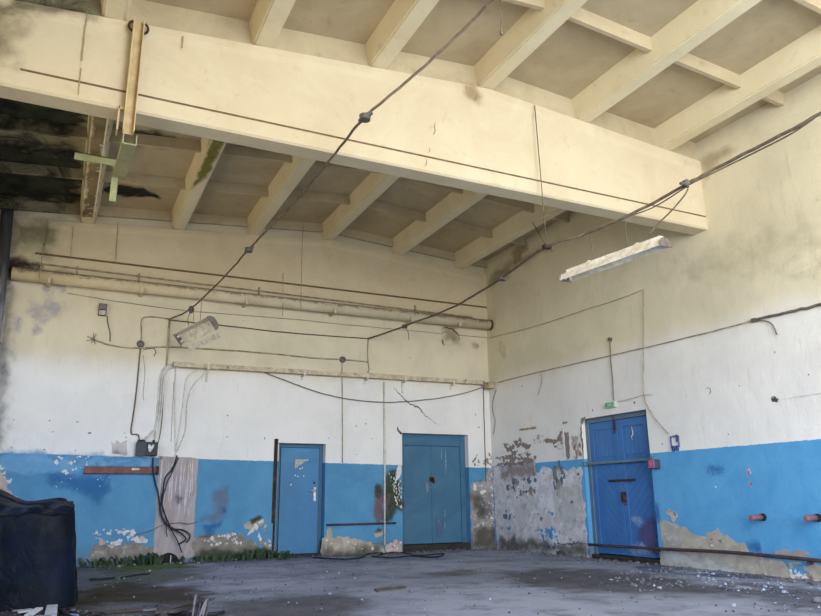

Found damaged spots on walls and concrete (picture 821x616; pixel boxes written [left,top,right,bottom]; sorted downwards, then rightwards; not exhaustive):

water stain [0,143,82,169]
water stain [0,172,82,203]
peeling [0,465,19,498]
peeling [469,428,589,558]
peeling [89,528,154,563]
spalling [192,516,271,562]
spalling [320,528,402,556]
peeling [614,509,821,595]